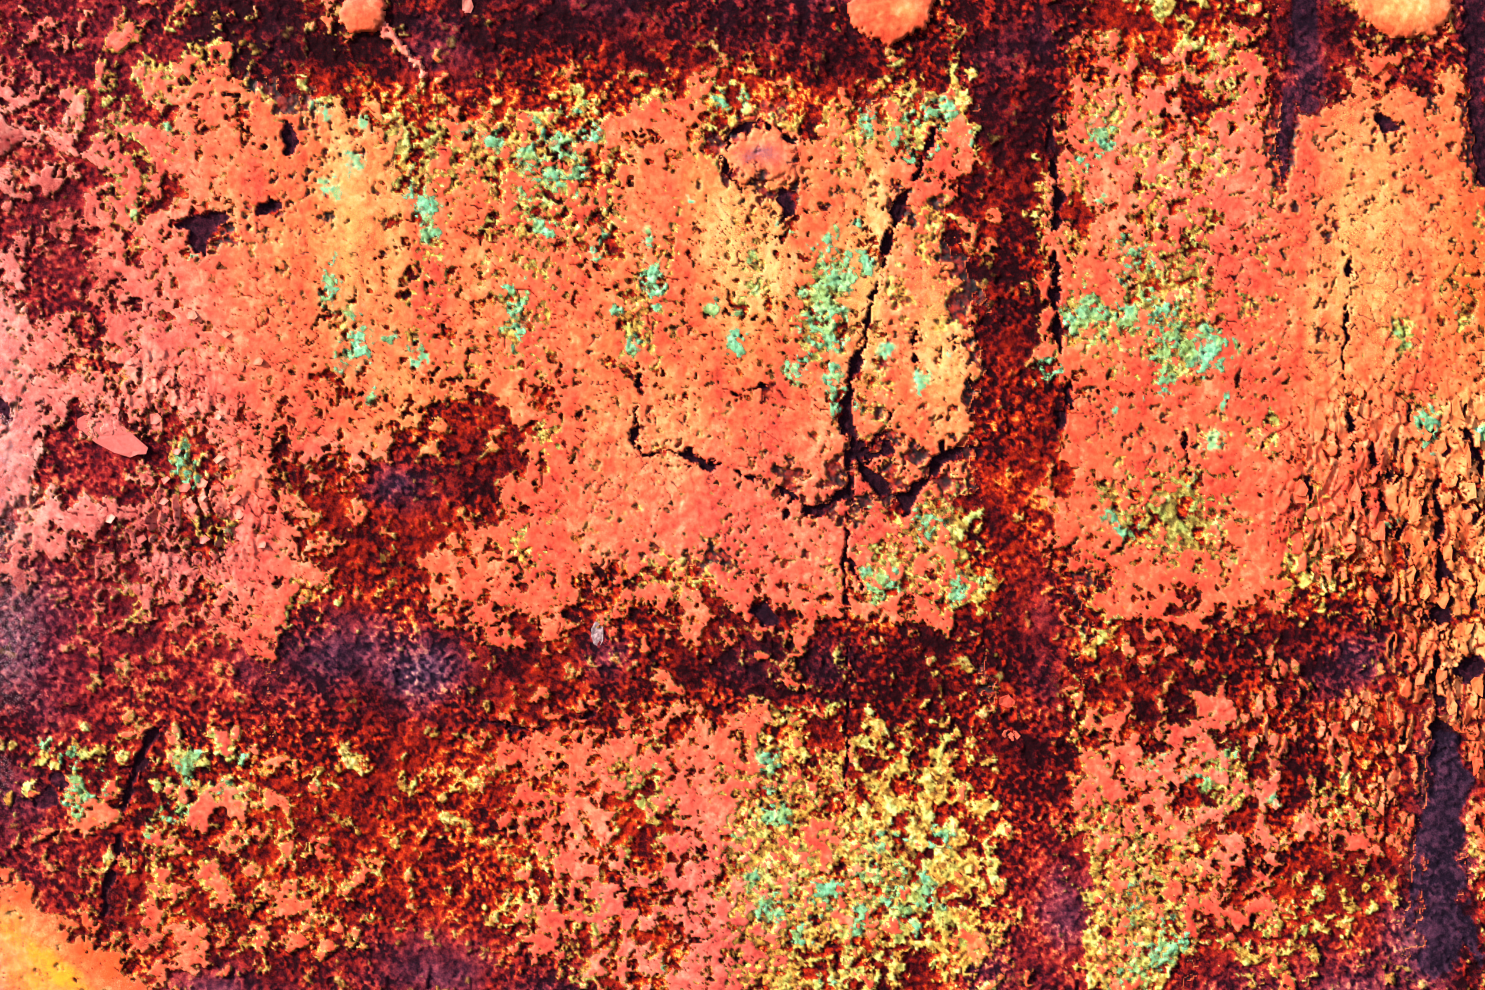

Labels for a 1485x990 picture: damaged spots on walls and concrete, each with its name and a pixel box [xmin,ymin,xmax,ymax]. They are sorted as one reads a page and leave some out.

peeling [95,78,301,297]
corrosion [263,347,319,391]
corrosion [383,352,418,385]
peeling [295,82,904,425]
crack [629,115,989,813]
corrosion [839,181,887,404]
corrosion [1056,288,1080,347]
corrosion [1131,585,1156,609]
peeling [1063,105,1485,949]
crack [1341,251,1485,737]
peeling [0,736,320,986]
peeling [522,724,1020,990]